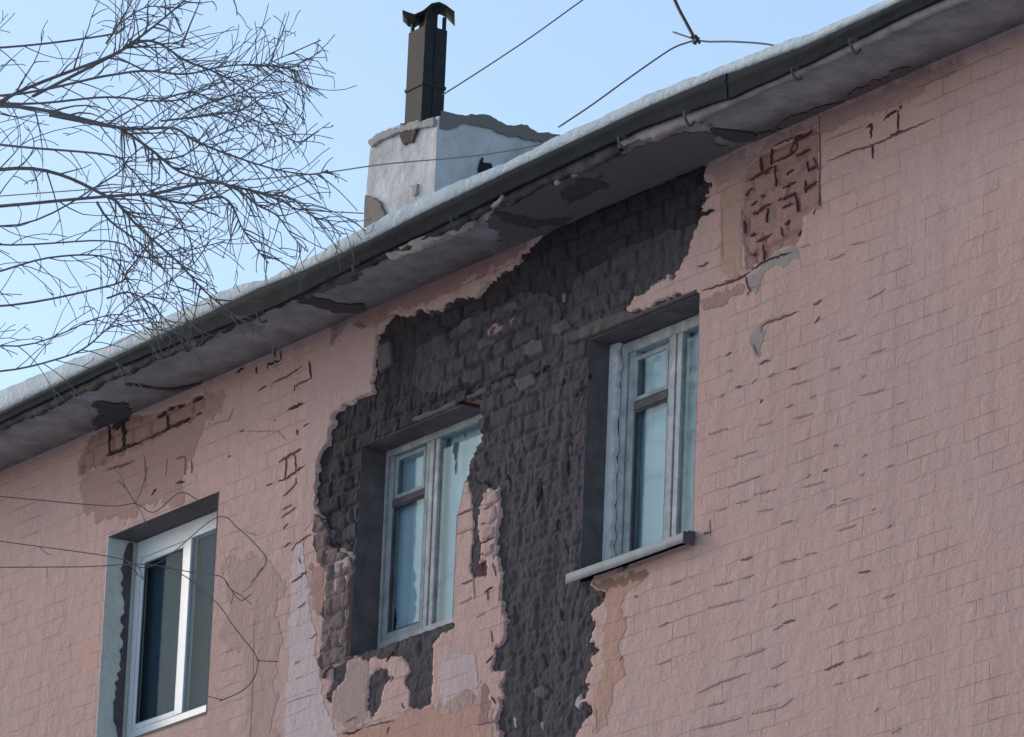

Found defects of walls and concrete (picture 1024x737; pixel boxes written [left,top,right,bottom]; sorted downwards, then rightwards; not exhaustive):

spalling [400,123,418,145]
spalling [478,157,493,173]
crack [819,119,932,206]
spalling [742,127,823,295]
spalling [81,395,206,475]
spalling [284,165,712,737]